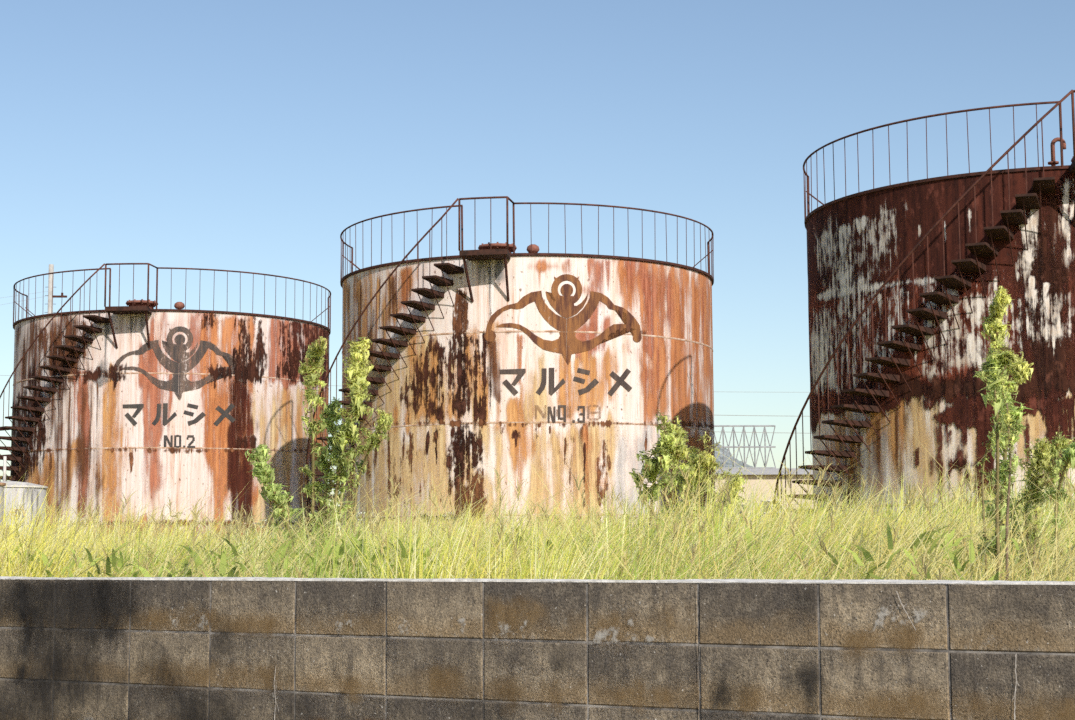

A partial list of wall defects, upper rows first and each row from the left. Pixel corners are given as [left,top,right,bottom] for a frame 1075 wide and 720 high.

rust [0,312,330,544]
rust [342,267,647,537]
rust [588,259,715,528]
rust [806,169,1075,516]
peeling [811,208,1071,393]
peeling [1059,181,1071,265]
leakage [0,580,132,720]